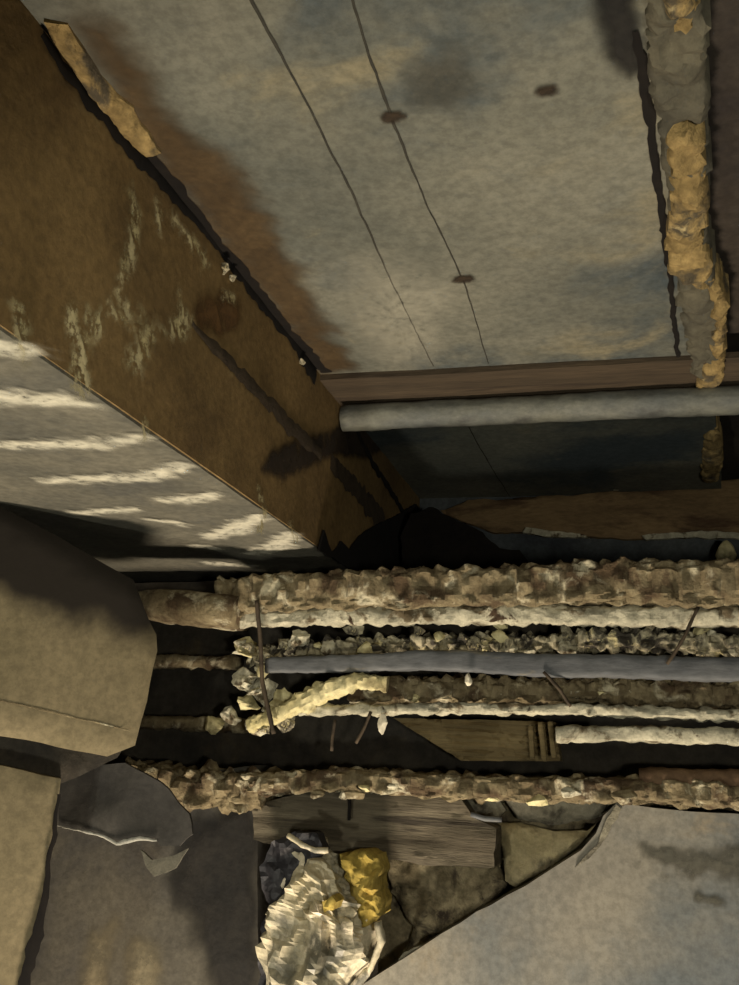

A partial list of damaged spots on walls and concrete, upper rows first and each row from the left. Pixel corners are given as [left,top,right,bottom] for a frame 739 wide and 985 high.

water stain [0,303,102,408]
spalling [44,18,161,157]
crack [40,26,332,385]
spalling [645,0,730,389]